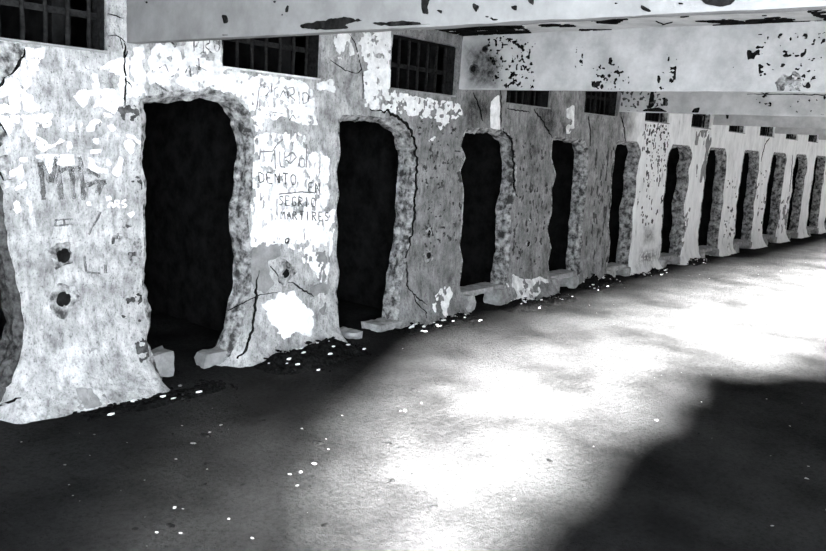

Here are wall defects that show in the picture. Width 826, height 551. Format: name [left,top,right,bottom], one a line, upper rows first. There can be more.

crack [0,48,26,87]
crack [331,34,427,318]
spalling [0,0,826,402]
crack [228,266,314,359]
spalling [76,387,120,410]